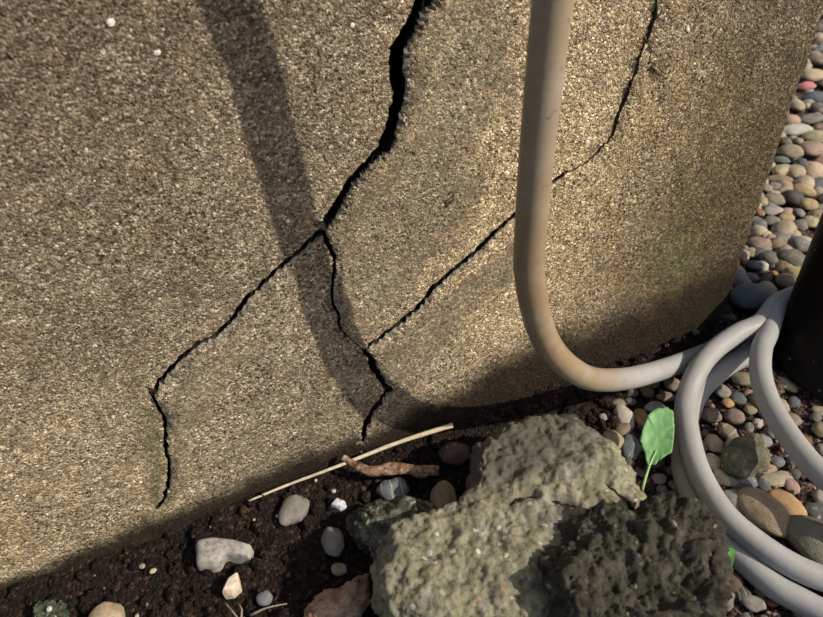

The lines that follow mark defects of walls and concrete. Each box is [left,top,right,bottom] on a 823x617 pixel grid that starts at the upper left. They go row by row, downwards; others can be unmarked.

crack [149,0,515,510]
crack [552,0,658,184]